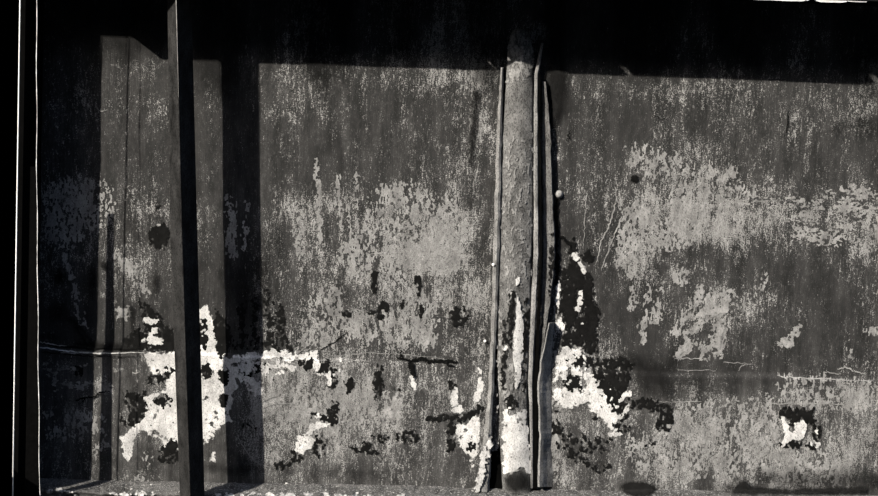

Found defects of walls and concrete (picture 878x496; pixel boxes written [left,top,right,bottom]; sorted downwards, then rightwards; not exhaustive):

damp [469,89,480,164]
damp [544,0,566,130]
peeling [199,158,472,471]
peeling [425,133,878,492]